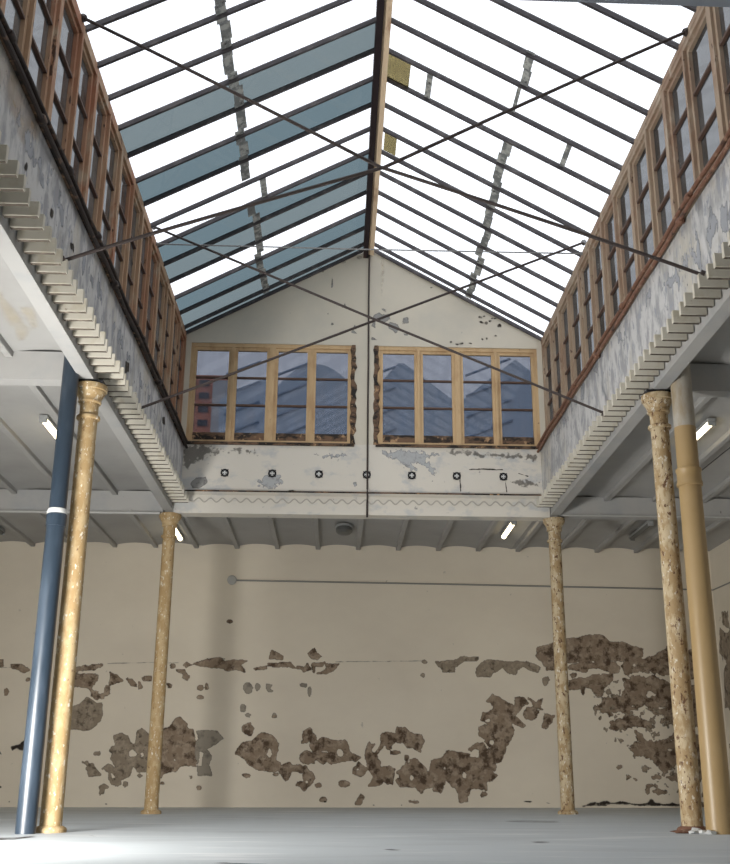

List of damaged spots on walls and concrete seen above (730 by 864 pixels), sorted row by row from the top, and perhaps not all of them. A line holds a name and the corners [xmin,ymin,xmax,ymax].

peeling [71,663,152,731]
flaking render [82,728,149,796]
flaking render [160,717,223,790]
flaking render [170,643,555,805]
peeling [566,634,679,795]
peeling [688,649,702,782]
peeling [719,611,730,710]